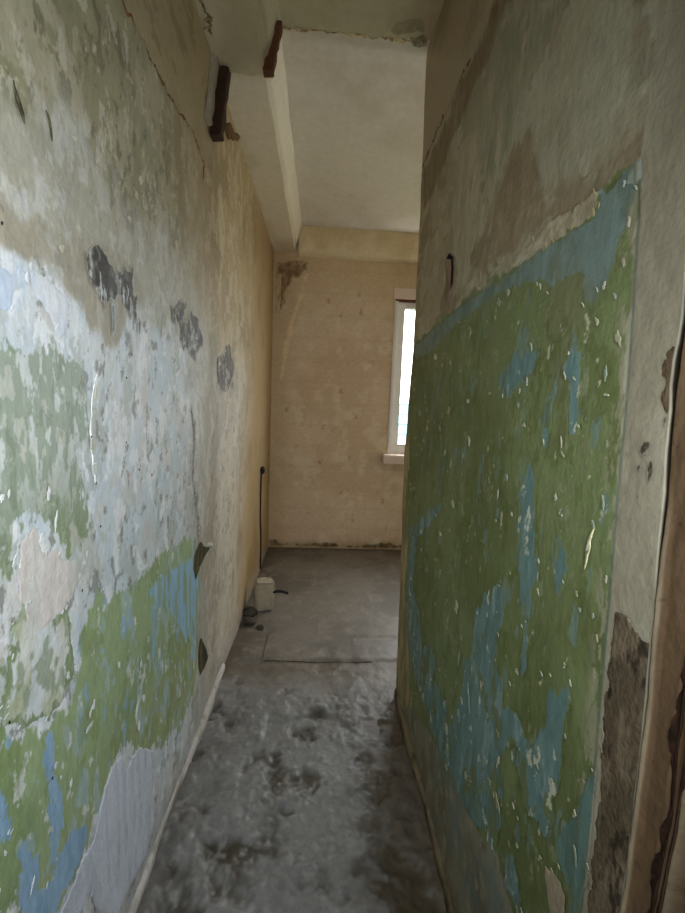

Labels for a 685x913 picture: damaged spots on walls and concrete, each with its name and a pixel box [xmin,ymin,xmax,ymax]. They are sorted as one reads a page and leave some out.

crack [121,0,205,179]
crack [199,0,213,35]
peeling [390,16,428,49]
peeling [413,129,643,362]
peeling [0,262,213,913]
peeling [396,340,649,913]
crack [647,659,685,913]